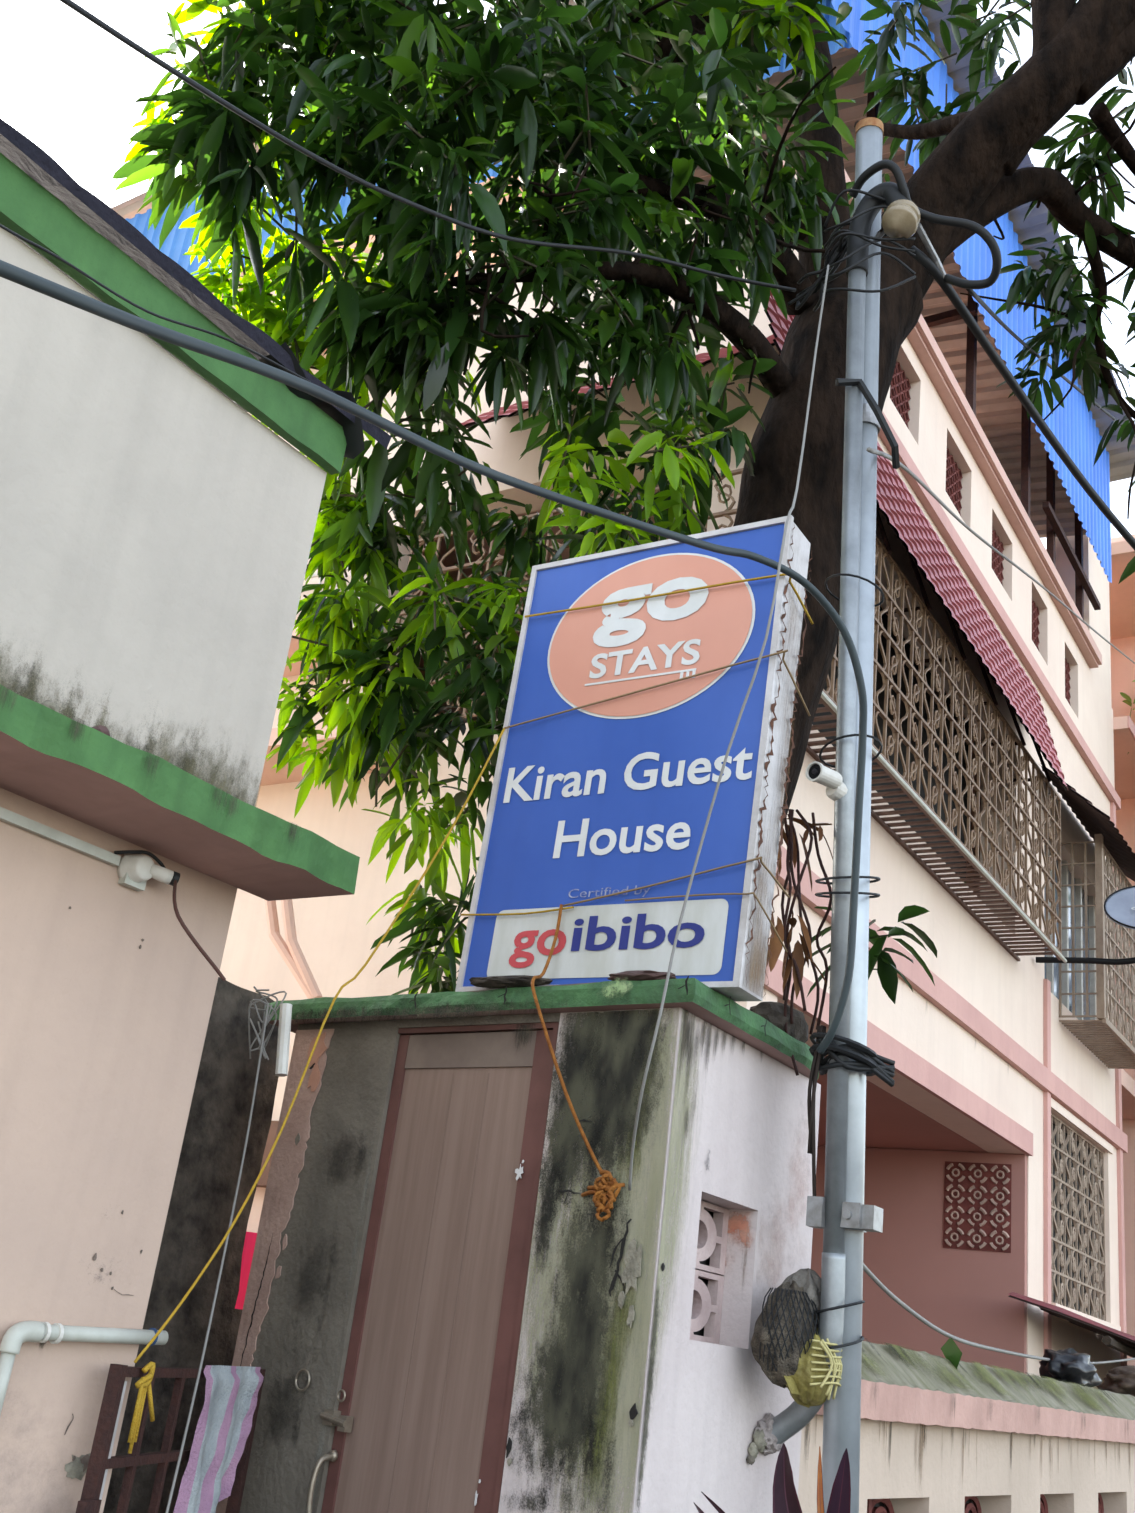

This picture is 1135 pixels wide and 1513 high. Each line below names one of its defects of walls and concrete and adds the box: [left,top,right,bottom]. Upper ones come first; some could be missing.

leakage [509,1004,762,1513]